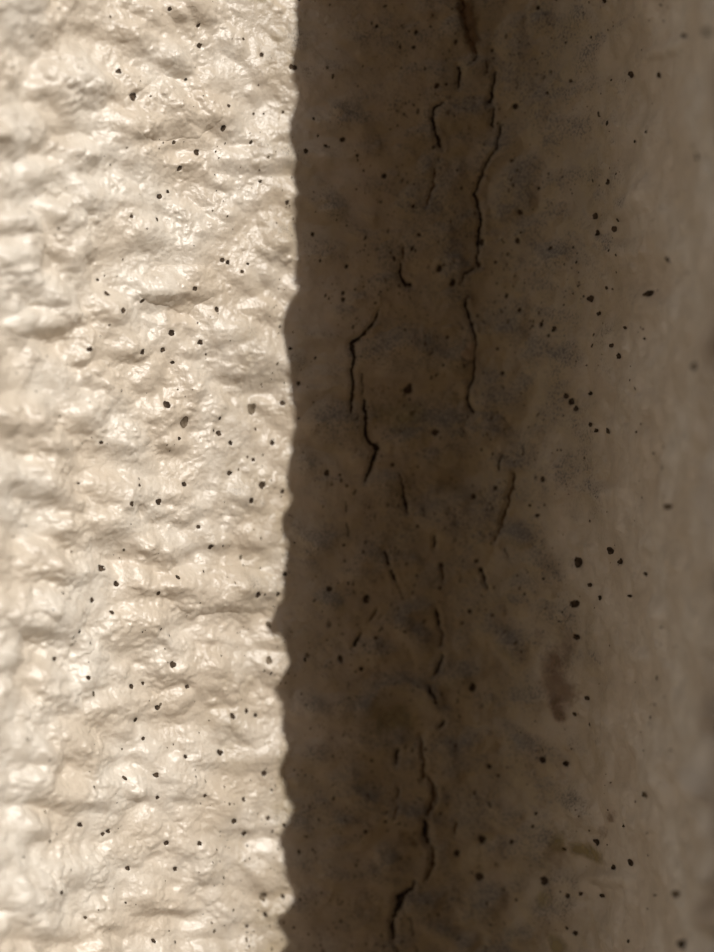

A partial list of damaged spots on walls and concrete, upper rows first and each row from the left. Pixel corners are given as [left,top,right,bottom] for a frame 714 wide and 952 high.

crack [425,0,502,414]
crack [398,246,412,287]
crack [345,309,380,537]
crack [398,471,408,514]
crack [494,448,524,558]
crack [383,551,402,600]
crack [433,535,488,589]
crack [353,609,377,647]
crack [389,608,445,952]